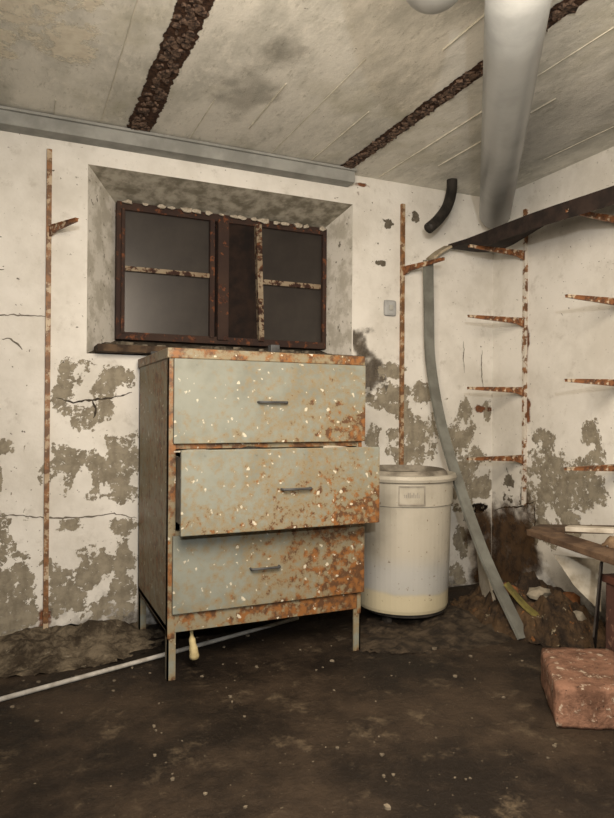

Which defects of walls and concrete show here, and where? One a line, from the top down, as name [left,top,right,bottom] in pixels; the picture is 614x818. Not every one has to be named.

peeling [0,438,25,455]
peeling [37,356,139,505]
crack [58,392,132,418]
peeling [364,361,439,465]
peeling [447,396,492,513]
peeling [503,418,609,537]
peeling [0,513,138,636]
peeling [448,488,469,586]